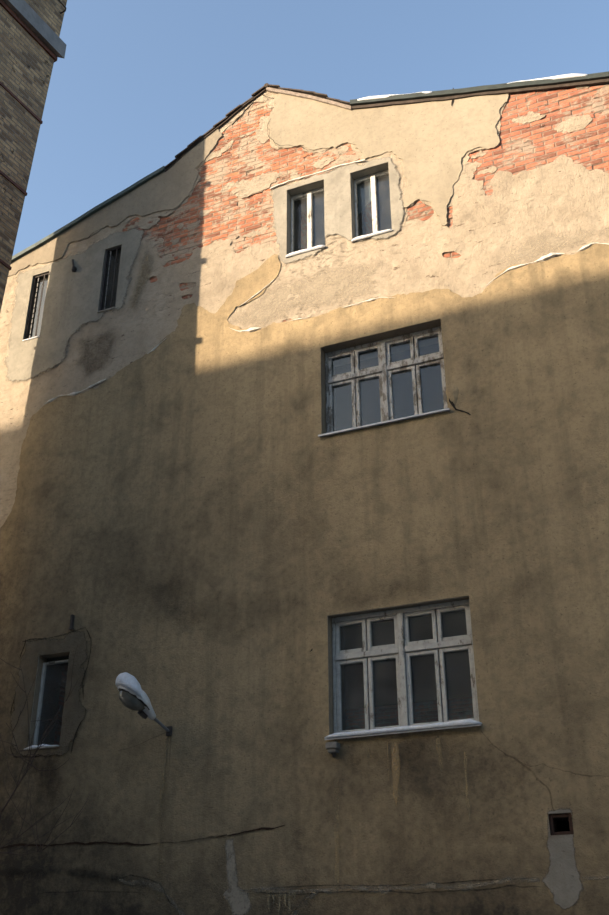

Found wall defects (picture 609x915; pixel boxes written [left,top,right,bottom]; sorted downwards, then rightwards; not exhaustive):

spalling [0,83,609,528]
crack [1,825,285,849]
crack [239,878,540,895]